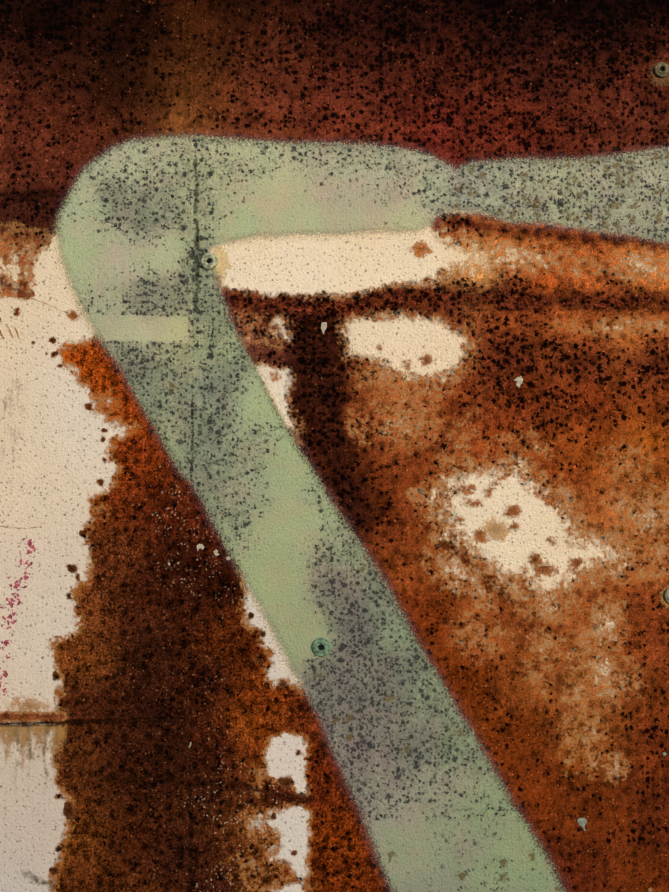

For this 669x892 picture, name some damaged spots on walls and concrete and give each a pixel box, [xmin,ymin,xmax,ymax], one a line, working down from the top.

rust [0,0,669,316]
rust [0,334,397,892]
rust [213,212,669,892]